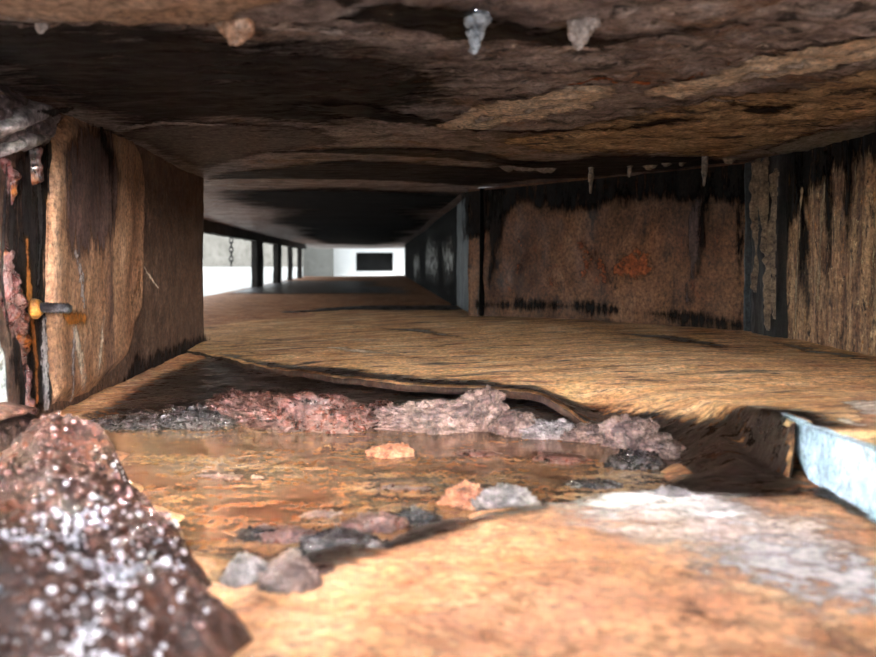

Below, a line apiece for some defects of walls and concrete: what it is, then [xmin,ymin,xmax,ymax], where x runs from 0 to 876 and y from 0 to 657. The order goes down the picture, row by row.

leakage [584,23,746,47]
corrosion [0,237,49,416]
leakage [0,3,705,309]
leakage [215,132,876,359]
leakage [80,336,876,614]